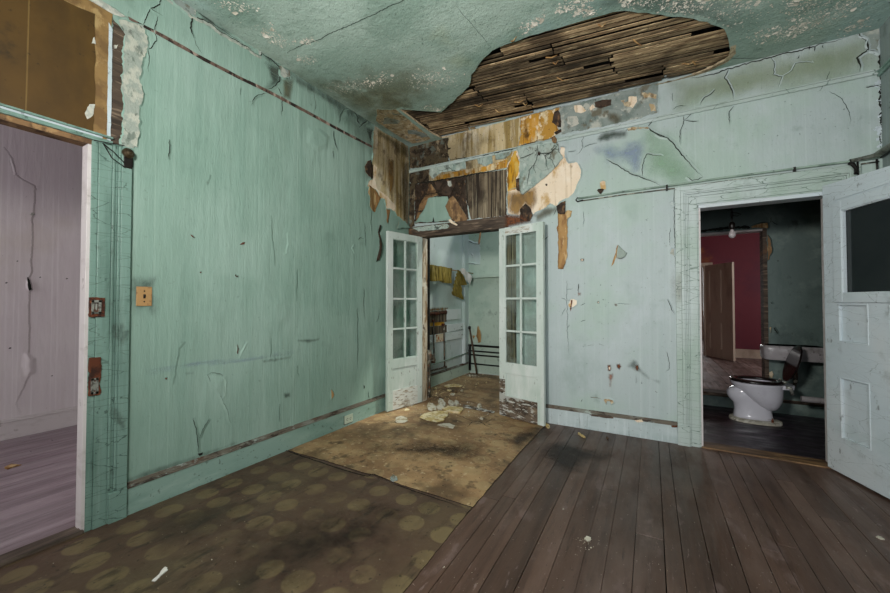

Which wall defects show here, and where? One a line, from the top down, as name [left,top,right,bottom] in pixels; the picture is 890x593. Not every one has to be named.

crack [3,147,37,354]
flaking render [90,0,150,151]
crack [140,0,403,111]
crack [416,138,550,184]
flaking render [351,81,661,269]
crack [568,30,882,186]